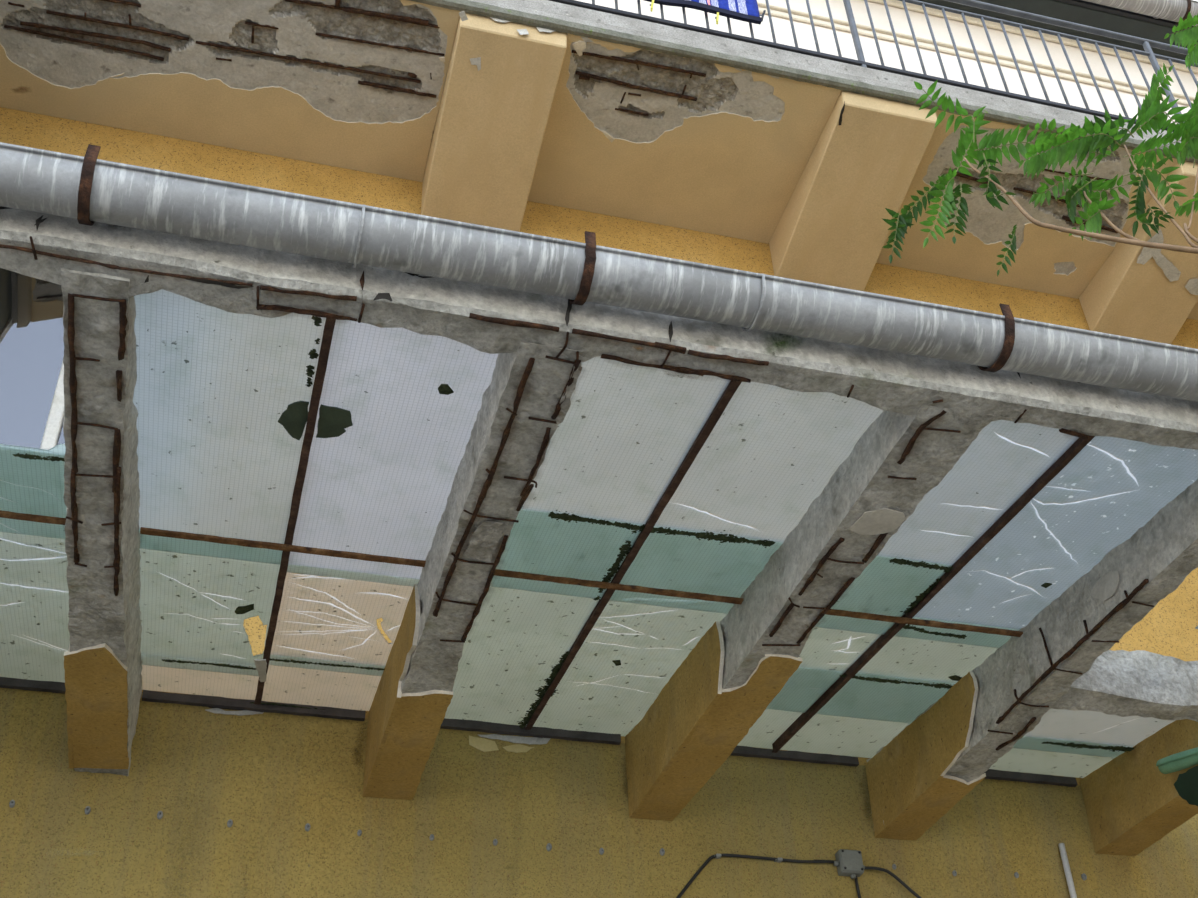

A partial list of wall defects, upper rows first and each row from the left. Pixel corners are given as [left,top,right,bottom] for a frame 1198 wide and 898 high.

spalling [0,0,451,123]
peeling [490,17,555,35]
spalling [566,37,785,143]
spalling [922,125,1137,249]
corrosion [0,236,365,323]
spalling [556,366,582,425]
corrosion [433,313,769,643]
corrosion [888,399,961,480]
corrosion [1059,428,1088,439]
spalling [464,521,504,563]
corrosion [762,533,888,646]